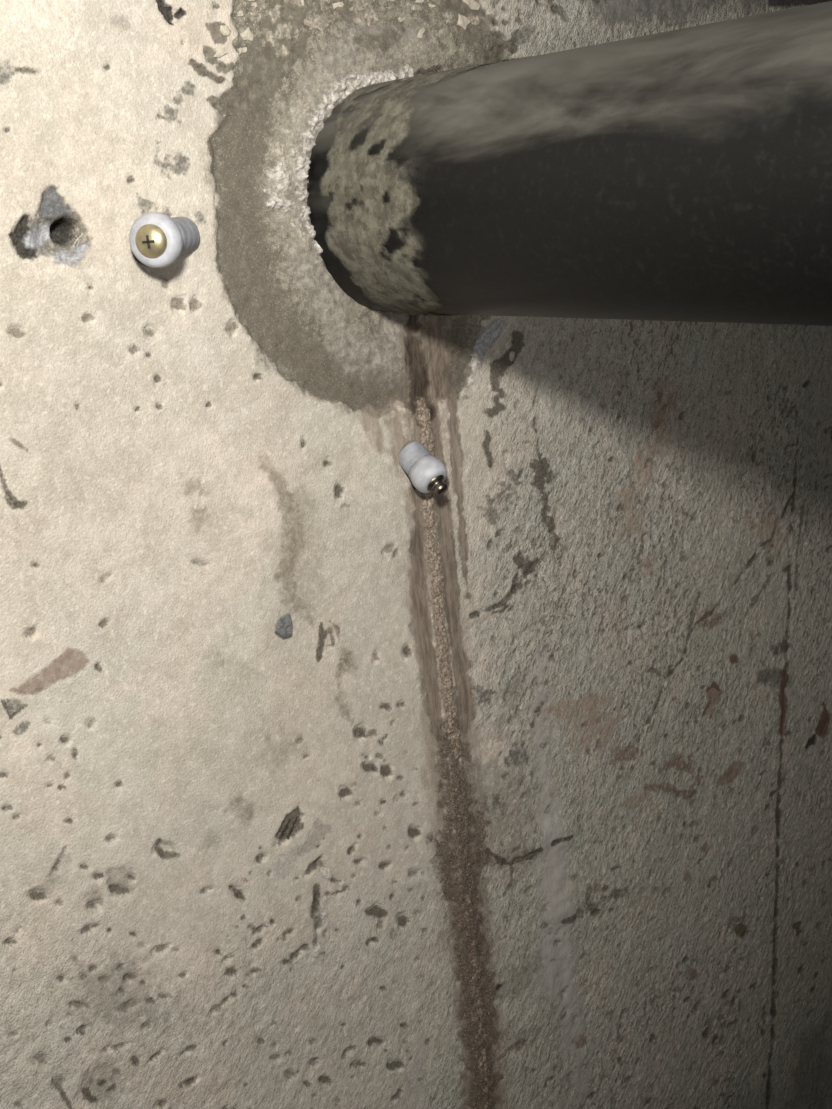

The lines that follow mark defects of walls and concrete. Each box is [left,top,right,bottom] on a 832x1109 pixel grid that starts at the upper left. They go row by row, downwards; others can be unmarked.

spalling [9,186,73,259]
damp [212,87,505,409]
crack [733,491,796,614]
crack [637,593,716,743]
crack [485,835,573,896]